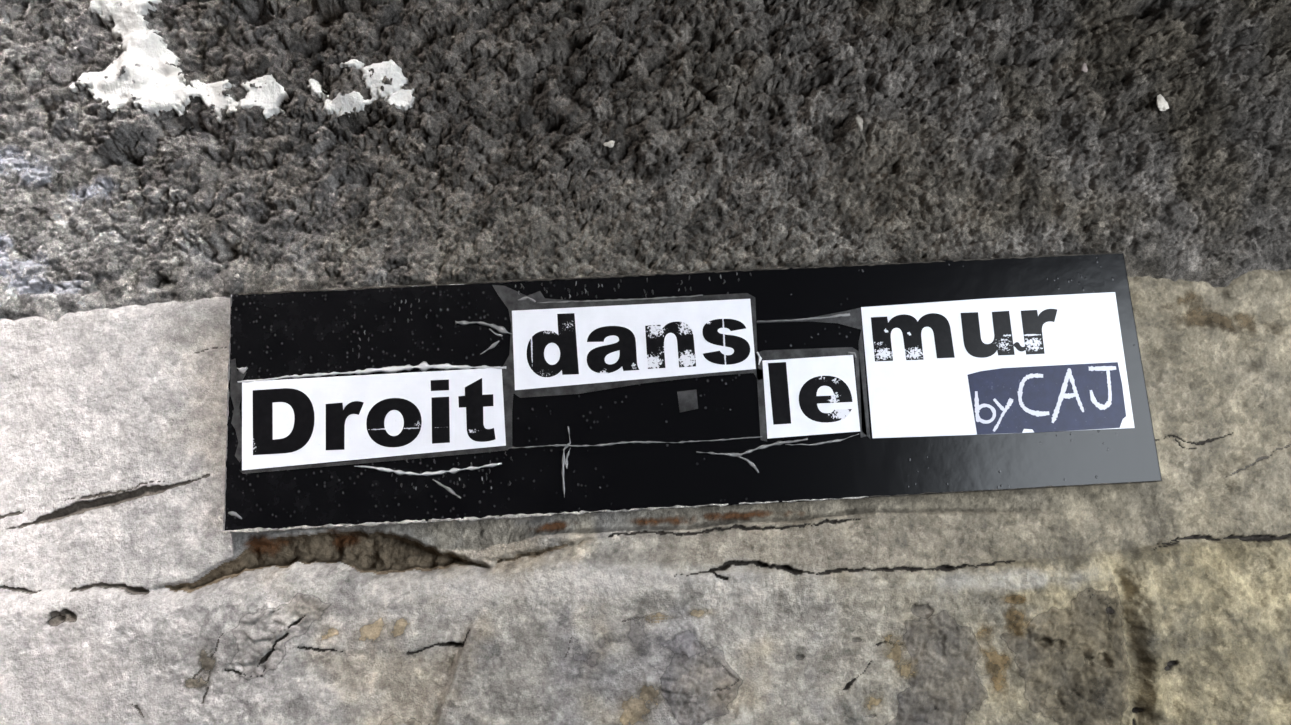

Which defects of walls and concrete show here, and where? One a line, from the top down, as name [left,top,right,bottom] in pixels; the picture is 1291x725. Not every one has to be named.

flaking render [68,0,290,128]
flaking render [308,59,416,121]
spalling [1156,94,1169,111]
spalling [220,269,244,295]
crack [0,474,210,529]
crack [608,519,1015,580]
crack [1154,534,1291,550]
crack [0,582,149,595]
crack [193,609,343,704]
crack [406,630,470,655]